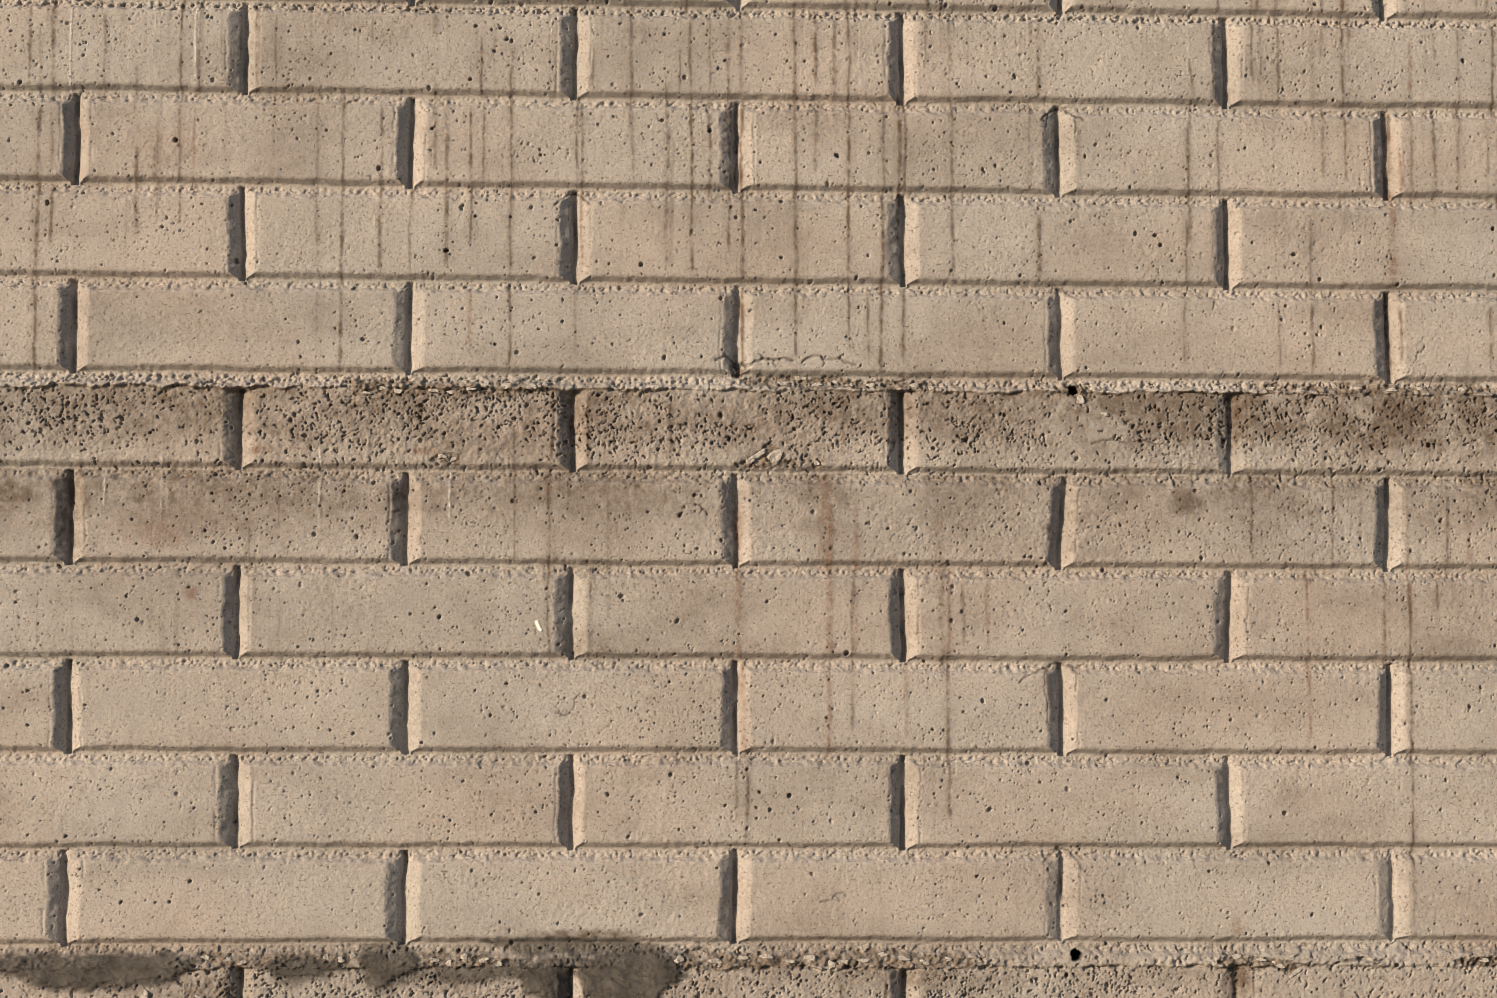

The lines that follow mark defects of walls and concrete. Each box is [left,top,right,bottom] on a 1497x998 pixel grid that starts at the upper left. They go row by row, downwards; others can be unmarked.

damp [690,80,743,262]
damp [881,99,906,261]